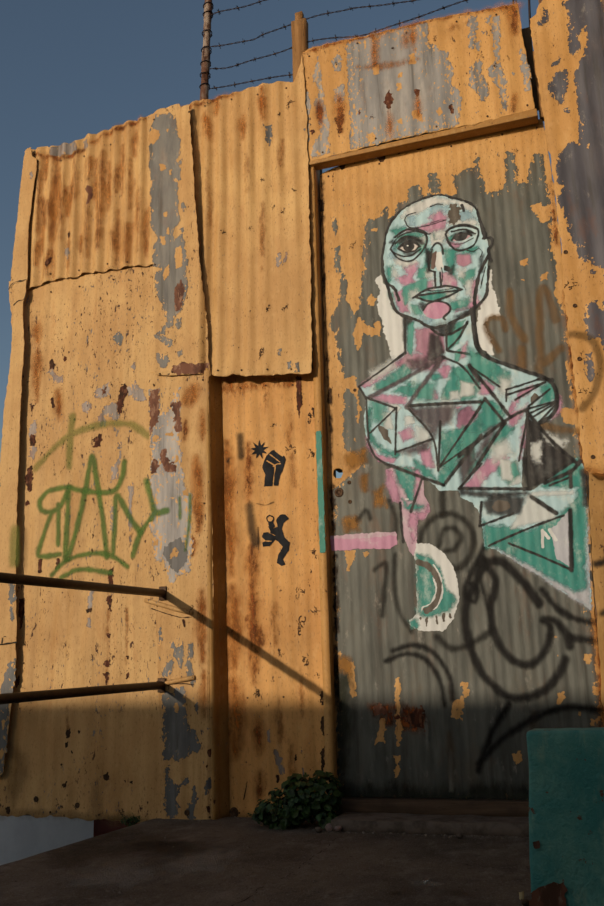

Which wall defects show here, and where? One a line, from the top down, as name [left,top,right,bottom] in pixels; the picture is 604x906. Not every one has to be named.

peeling [113,331,123,346]
peeling [81,362,194,585]
peeling [148,112,210,375]
peeling [303,0,604,794]
corrosion [226,546,263,647]
peeling [0,658,16,775]
peeling [158,627,212,820]
corrosion [370,703,426,732]